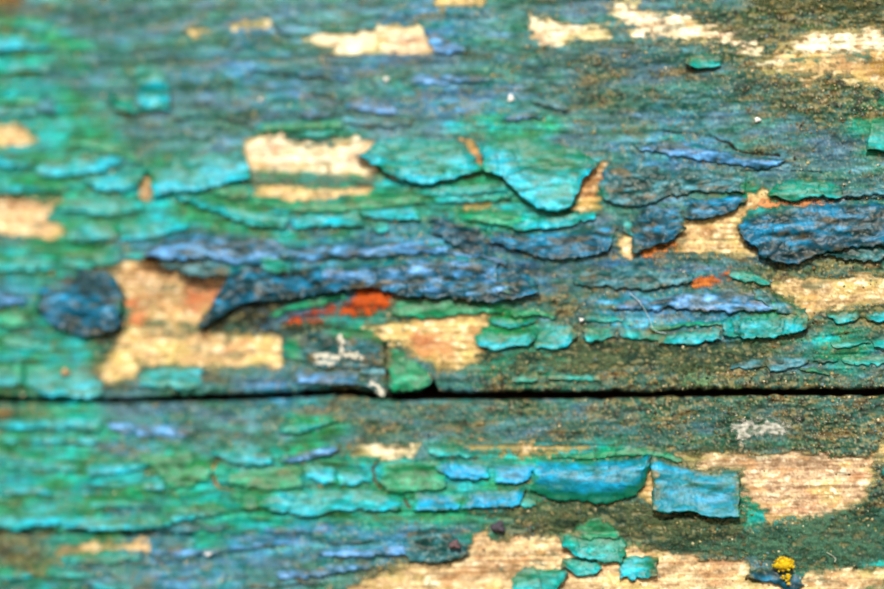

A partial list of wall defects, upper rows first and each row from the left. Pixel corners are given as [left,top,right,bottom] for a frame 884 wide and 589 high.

peeling [0,18,53,76]
peeling [187,27,209,39]
peeling [229,19,271,31]
peeling [302,23,469,55]
peeling [529,0,884,89]
peeling [106,66,172,114]
peeling [409,71,493,86]
peeling [0,88,884,400]
peeling [0,415,884,589]